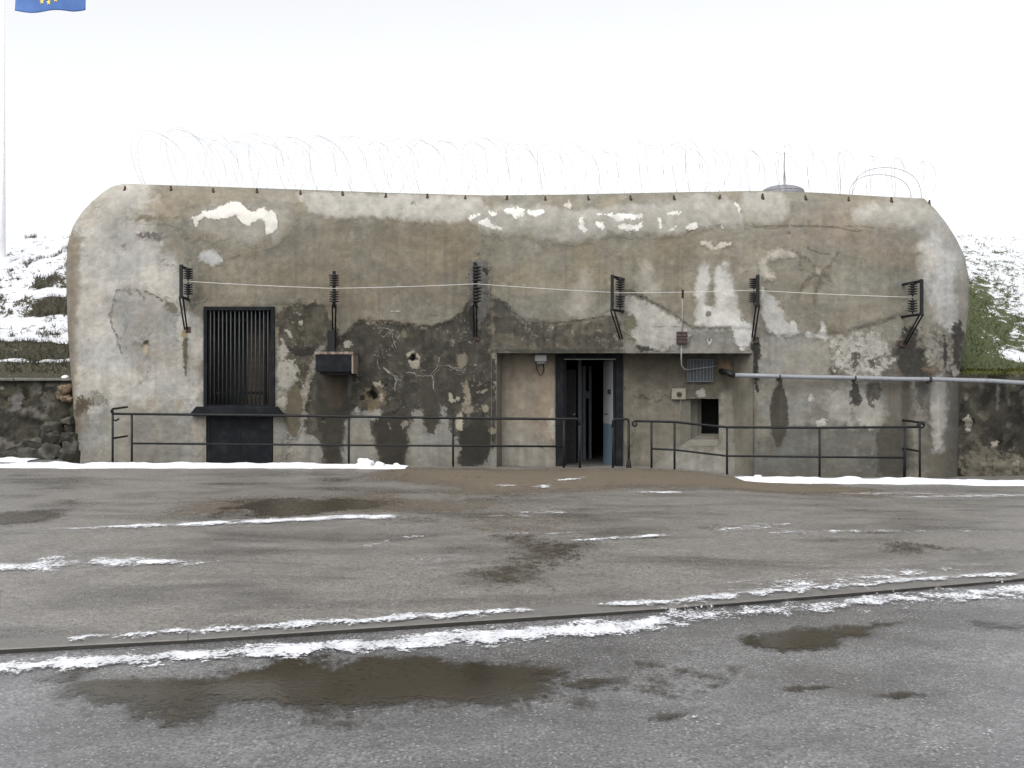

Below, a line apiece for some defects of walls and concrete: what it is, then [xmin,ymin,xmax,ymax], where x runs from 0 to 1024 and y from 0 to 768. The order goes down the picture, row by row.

peeling [181,200,299,268]
crack [377,310,466,393]
spalling [275,192,755,467]
spalling [827,328,900,381]
damp [950,318,965,371]
damp [767,320,952,478]